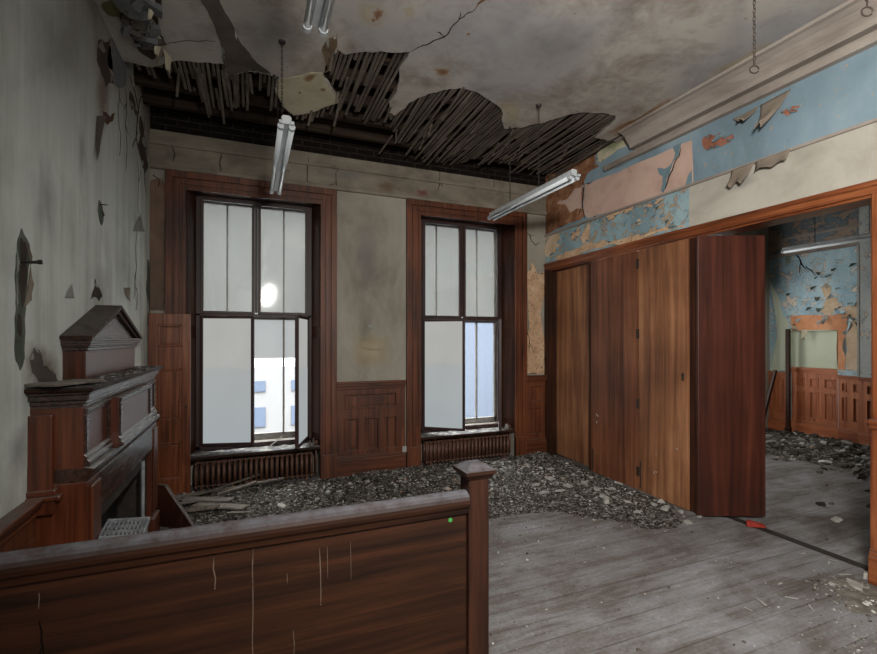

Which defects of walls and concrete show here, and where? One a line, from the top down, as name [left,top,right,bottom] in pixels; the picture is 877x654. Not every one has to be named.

spalling [129,34,163,60]
peeling [201,0,336,115]
crack [410,0,485,52]
peeling [733,89,800,130]
spalling [96,38,165,322]
peeling [545,132,734,260]
peeling [727,149,790,188]
peeling [14,229,58,382]
peeling [91,279,102,301]
spalling [770,268,857,371]